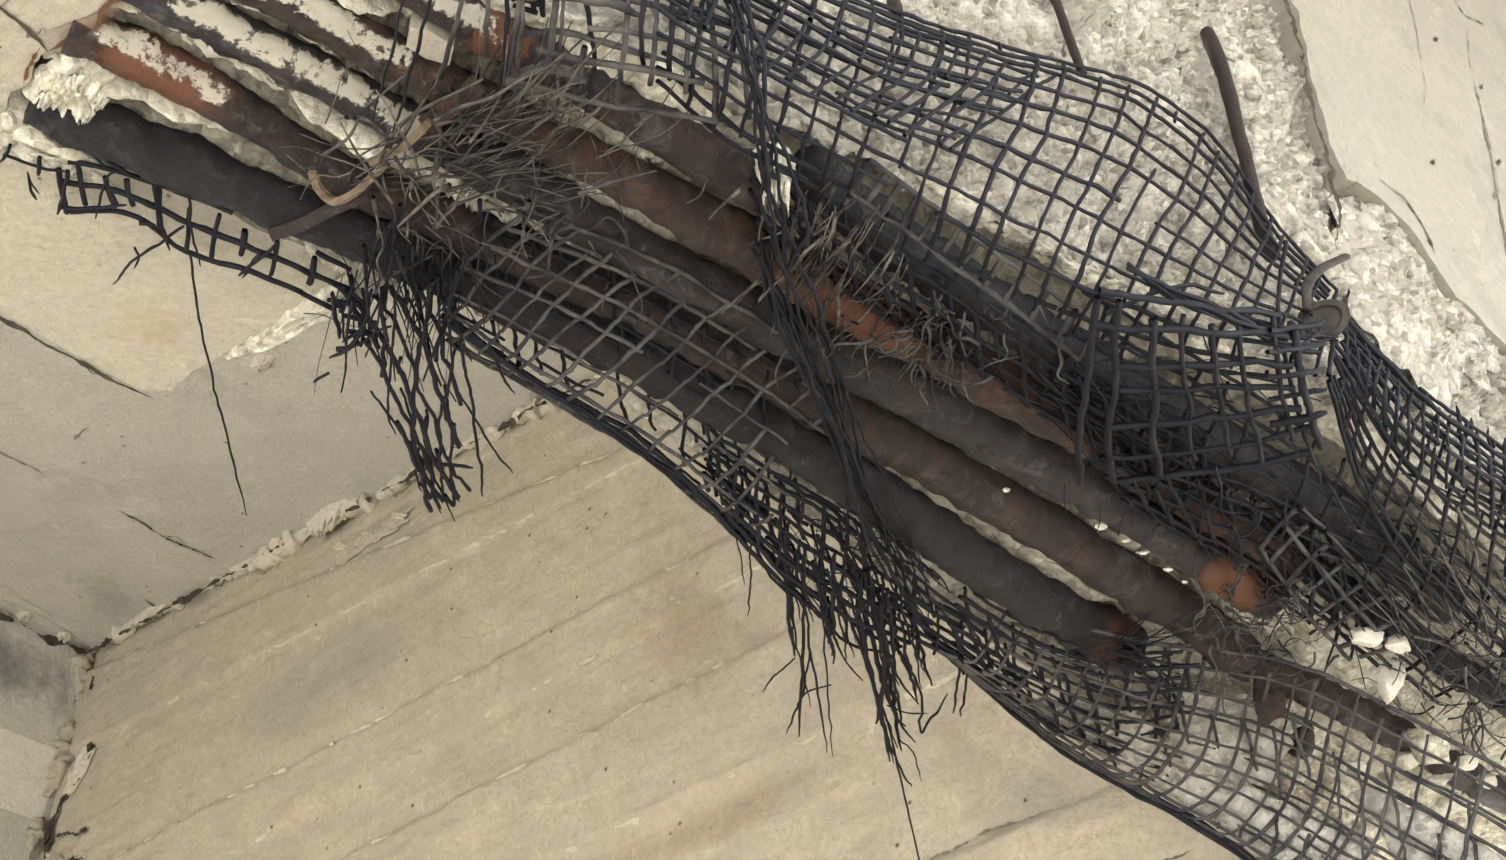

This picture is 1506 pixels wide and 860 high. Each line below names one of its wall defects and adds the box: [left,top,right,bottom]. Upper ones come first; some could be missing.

crack [0,0,119,87]
corrosion [94,0,239,116]
corrosion [467,7,534,68]
spalling [0,50,334,196]
crack [0,316,151,398]
corrosion [764,250,924,358]
spalling [451,0,1506,685]
crack [0,511,307,690]
spalling [551,345,1254,770]
corrosion [1196,541,1274,613]
crack [41,742,93,860]
spalling [1274,698,1506,860]